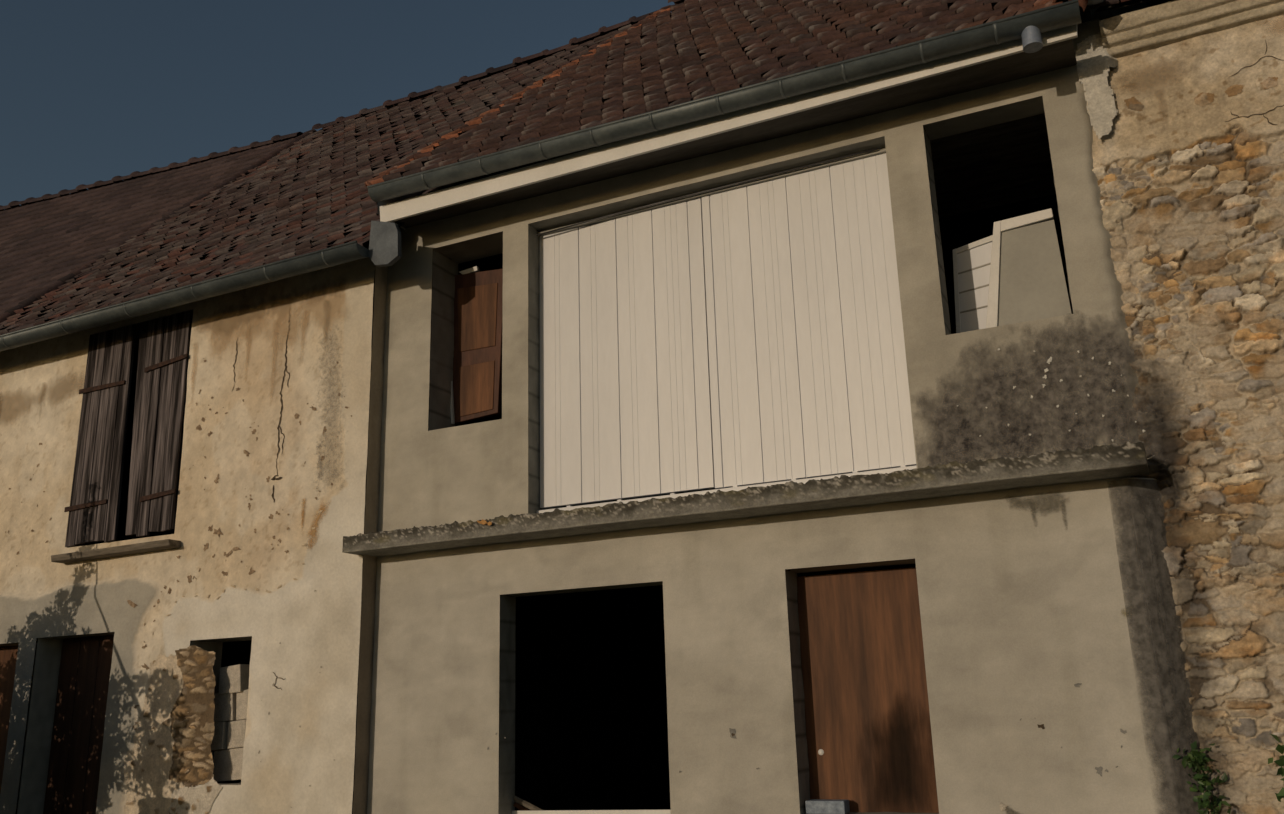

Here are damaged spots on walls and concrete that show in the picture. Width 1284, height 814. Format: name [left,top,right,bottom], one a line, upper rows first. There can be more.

crack [1226,105,1284,125]
crack [271,304,290,502]
leakage [919,326,1160,467]
corrosion [302,500,325,547]
leakage [1010,493,1066,522]
spalling [123,525,304,814]
leakage [1110,479,1207,814]